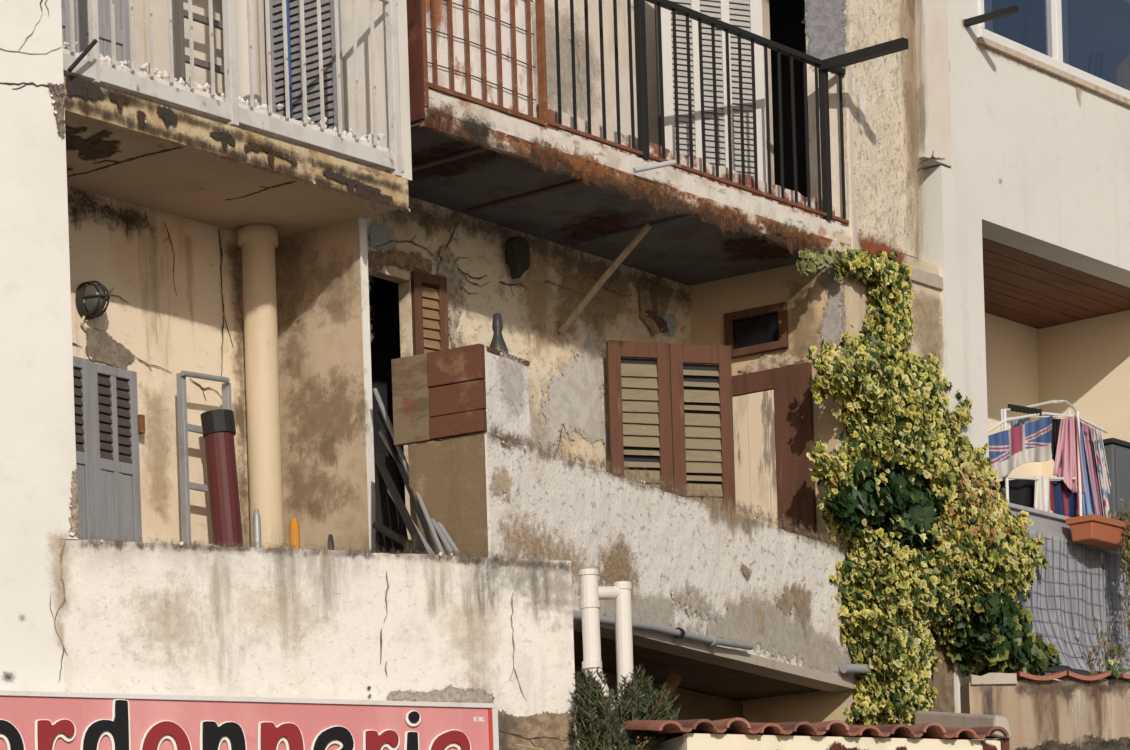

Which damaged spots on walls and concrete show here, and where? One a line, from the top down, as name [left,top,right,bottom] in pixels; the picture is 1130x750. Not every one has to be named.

crack [0,81,53,89]
crack [0,0,62,54]
spalling [48,83,121,172]
water stain [68,187,153,239]
crack [134,223,234,399]
rust [64,75,837,263]
crack [368,224,632,300]
water stain [901,0,925,251]
peeling [488,330,850,554]
crack [50,539,68,680]
peeling [631,562,858,681]
peeling [826,741,869,750]